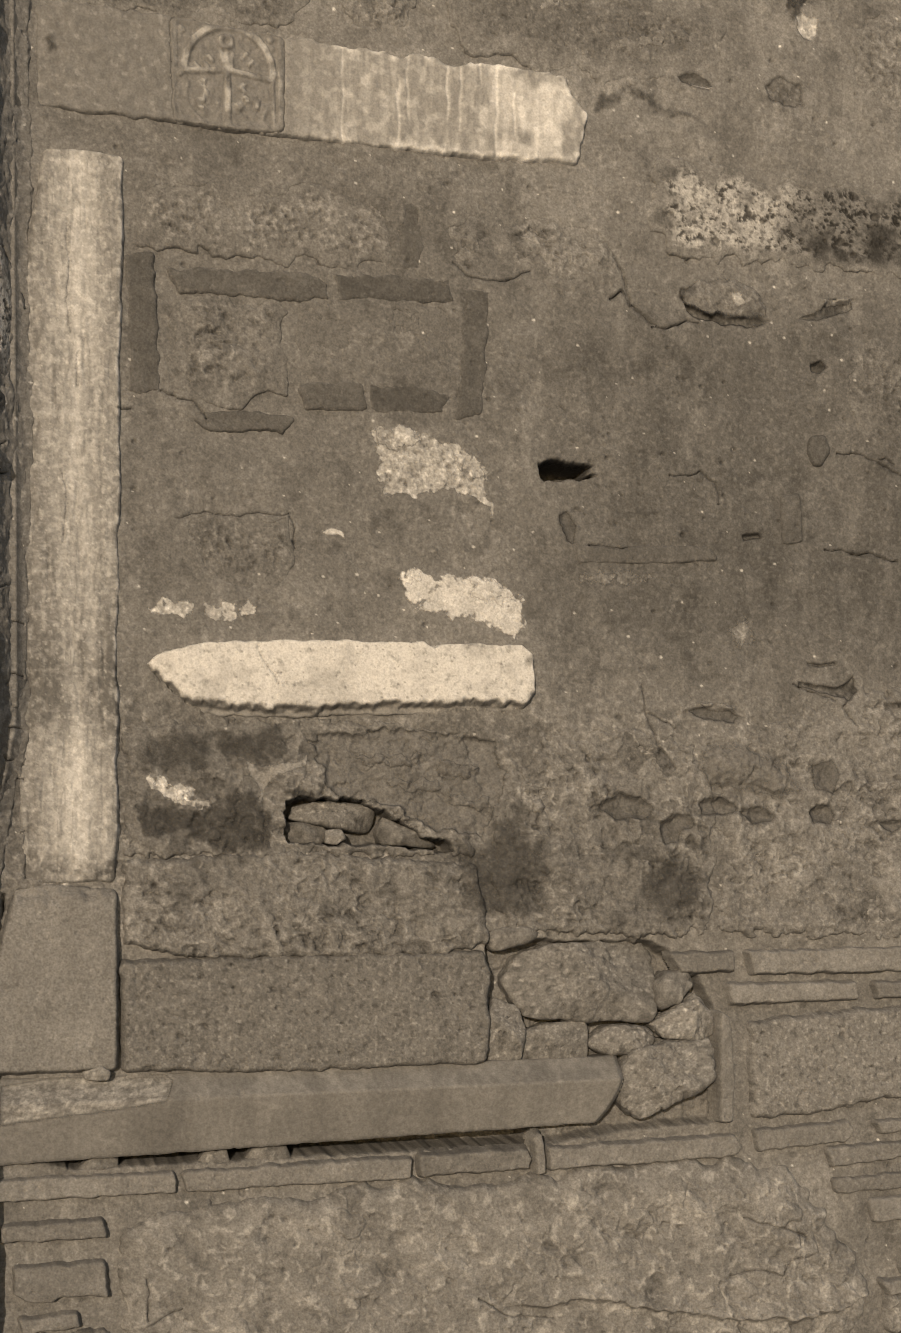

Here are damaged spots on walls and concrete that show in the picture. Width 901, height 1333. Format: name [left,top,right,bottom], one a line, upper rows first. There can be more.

crack [609,255,699,331]
peeling [371,425,494,516]
crack [836,450,901,477]
peeling [400,569,527,639]
crack [641,685,677,770]
crack [792,682,859,727]